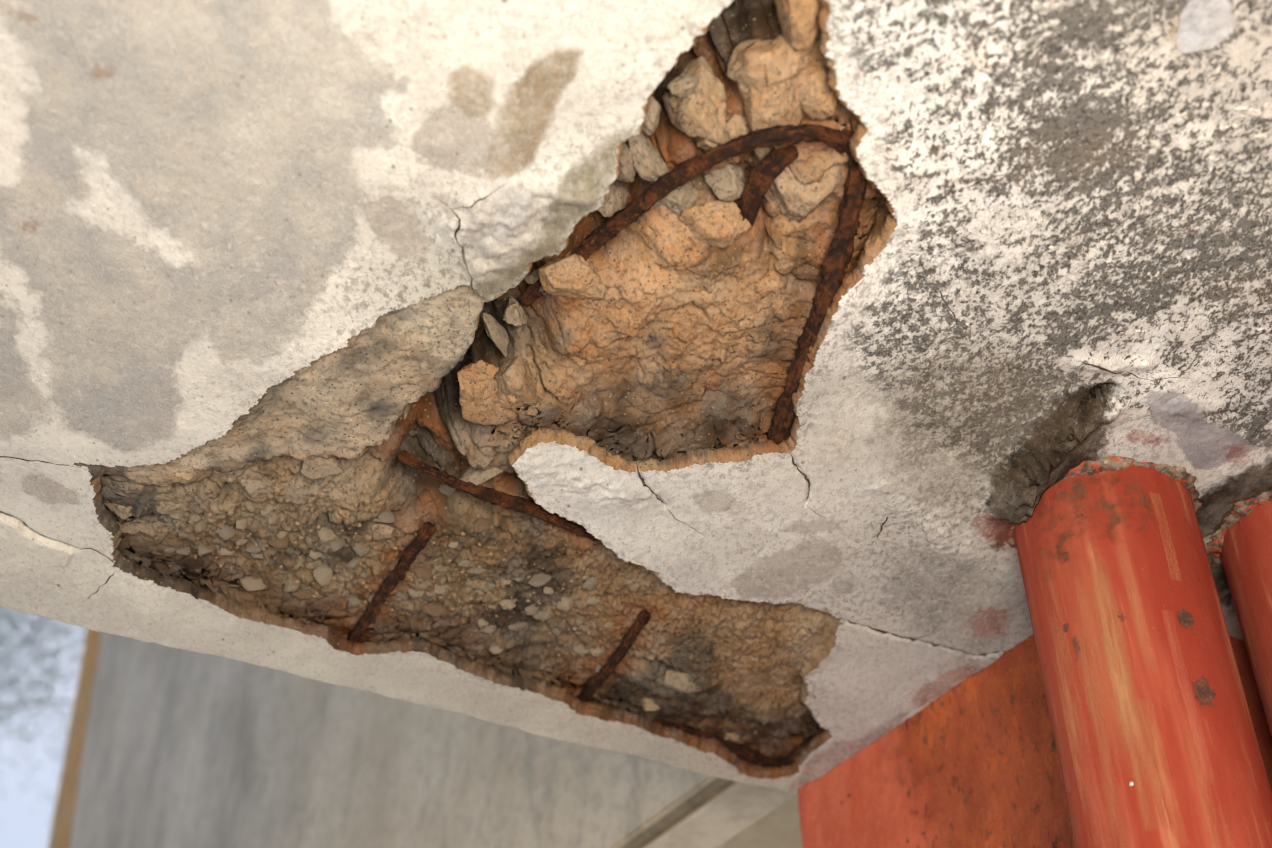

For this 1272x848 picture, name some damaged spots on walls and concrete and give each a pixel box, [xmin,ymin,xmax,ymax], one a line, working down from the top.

damp [414,52,578,176]
damp [0,0,426,451]
crack [438,183,508,292]
damp [478,134,631,296]
spalling [73,0,1272,481]
crack [636,462,703,535]
damp [985,382,1113,548]
crack [80,548,115,603]
spalling [89,364,842,780]
crack [848,620,999,656]
peeling [1178,609,1194,628]
peeling [1193,677,1216,706]